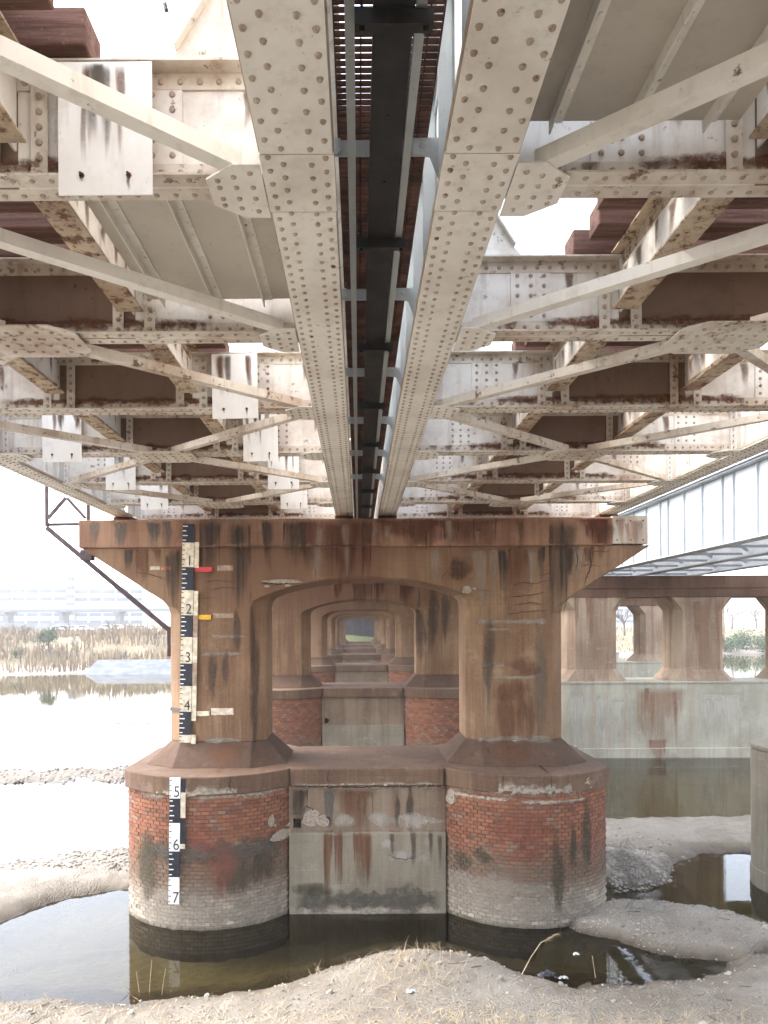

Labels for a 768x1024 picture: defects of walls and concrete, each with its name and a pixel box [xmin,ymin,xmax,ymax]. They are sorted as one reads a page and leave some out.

water stain [83,66,124,94]
corrosion [647,152,726,170]
corrosion [743,154,768,169]
corrosion [499,394,744,422]
corrosion [128,474,549,578]
corrosion [575,519,642,558]
spalling [445,788,455,804]
spalling [264,805,330,846]
corrosion [334,834,371,871]
water stain [293,782,587,915]
water stain [140,832,279,928]